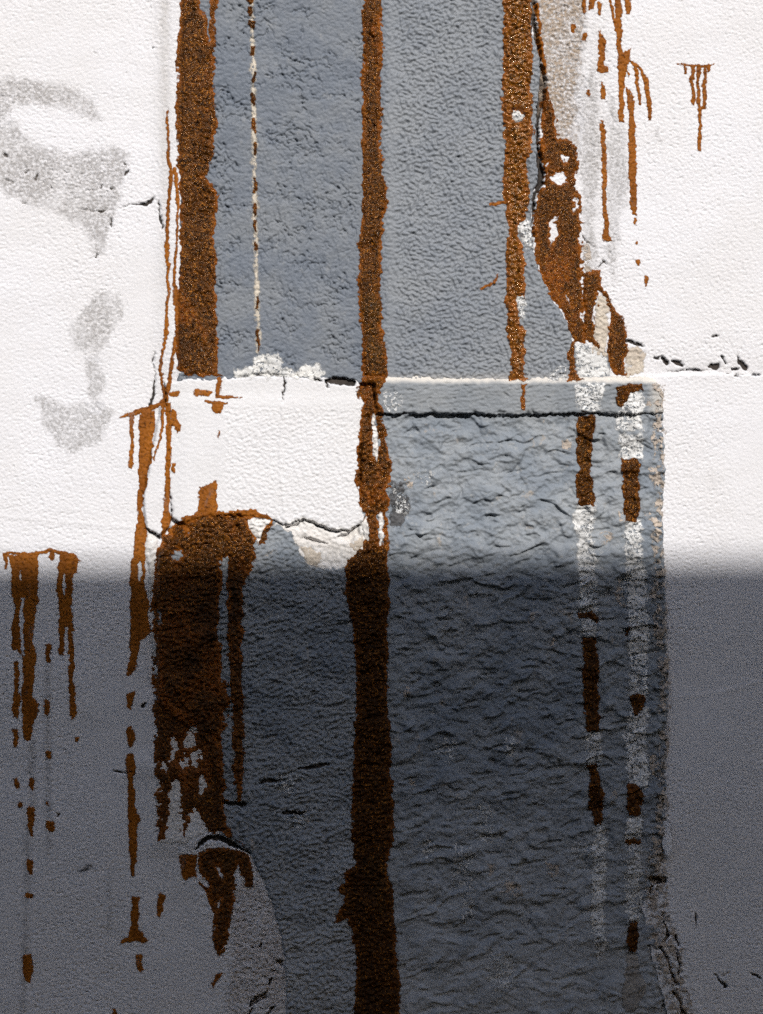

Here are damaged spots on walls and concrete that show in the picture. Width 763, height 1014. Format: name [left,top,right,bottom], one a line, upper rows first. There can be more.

rust [677,63,714,151]
rust [480,0,652,410]
flaking render [145,533,158,593]
rust [119,0,273,956]
flaking render [248,477,413,571]
rust [334,0,402,1014]
flaking render [371,414,379,459]
rust [575,414,596,507]
rust [621,458,641,523]
rust [3,548,80,748]
peeling [572,383,692,1014]
flaking render [230,883,283,1014]